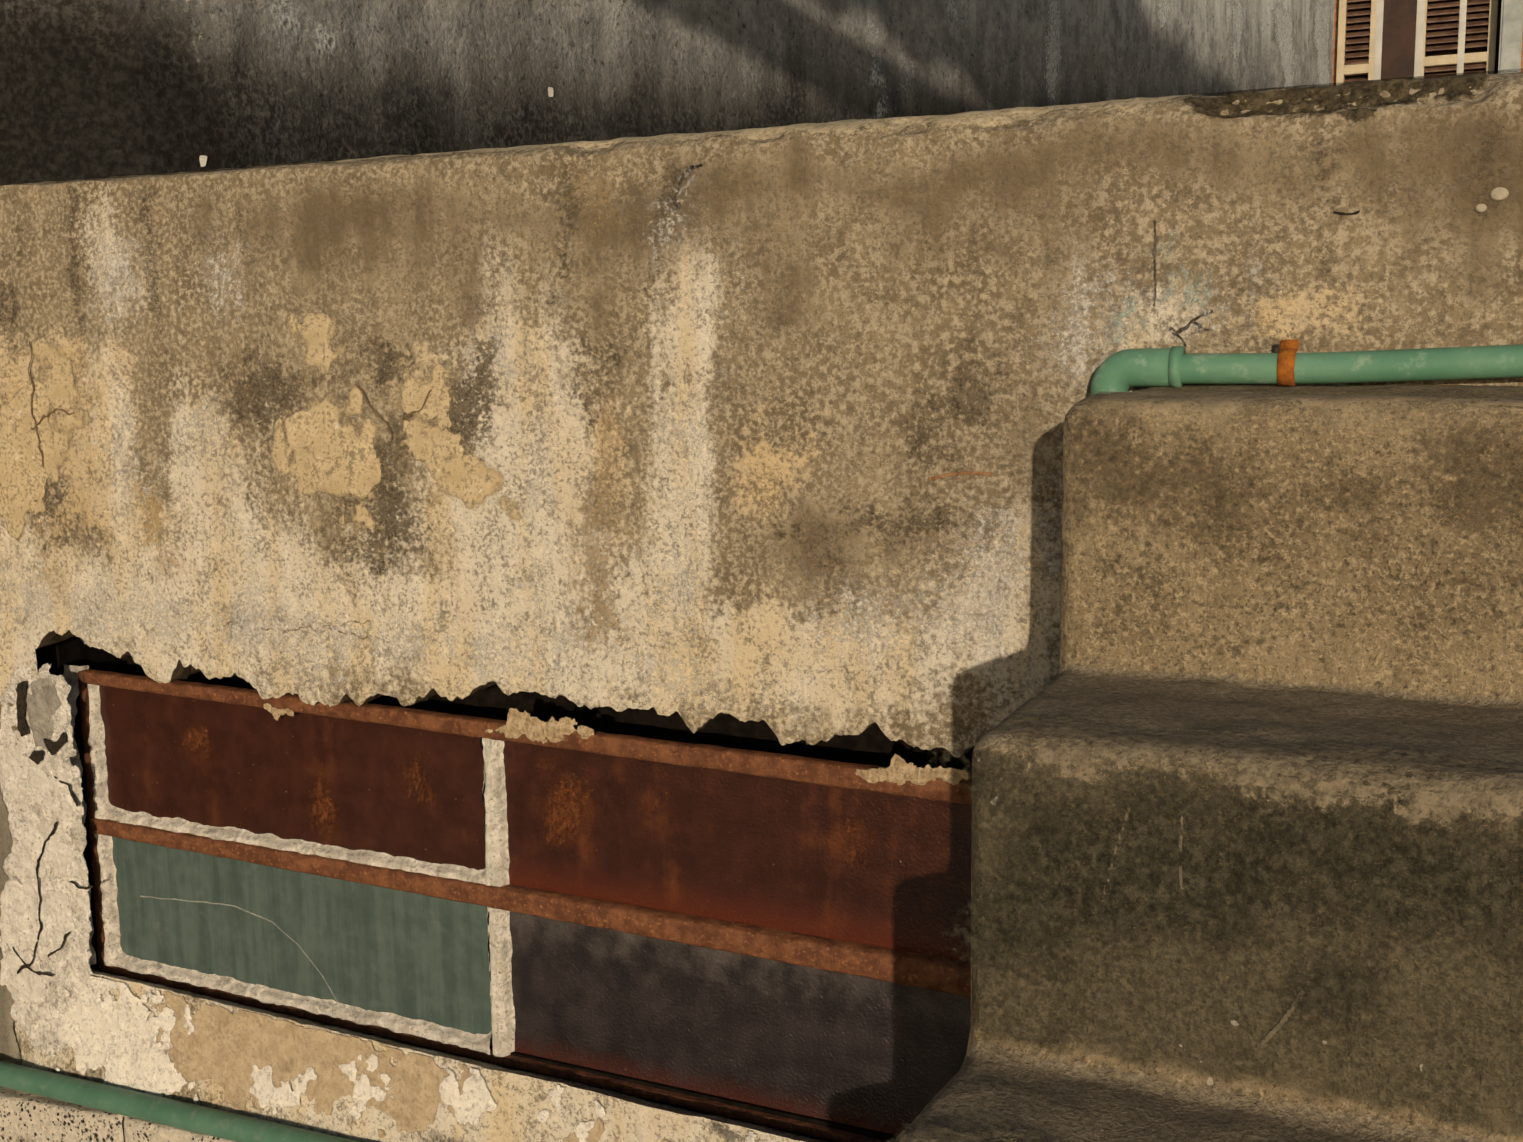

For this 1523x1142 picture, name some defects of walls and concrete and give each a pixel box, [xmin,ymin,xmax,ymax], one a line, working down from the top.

spalling [1183,73,1488,122]
peeling [0,339,90,540]
crack [28,341,75,468]
damp [0,479,429,683]
damp [191,339,322,460]
peeling [271,364,521,532]
damp [303,332,521,585]
damp [901,346,1011,472]
damp [810,418,1255,664]
spalling [343,684,974,786]
crack [12,776,93,977]
spalling [0,663,497,1138]